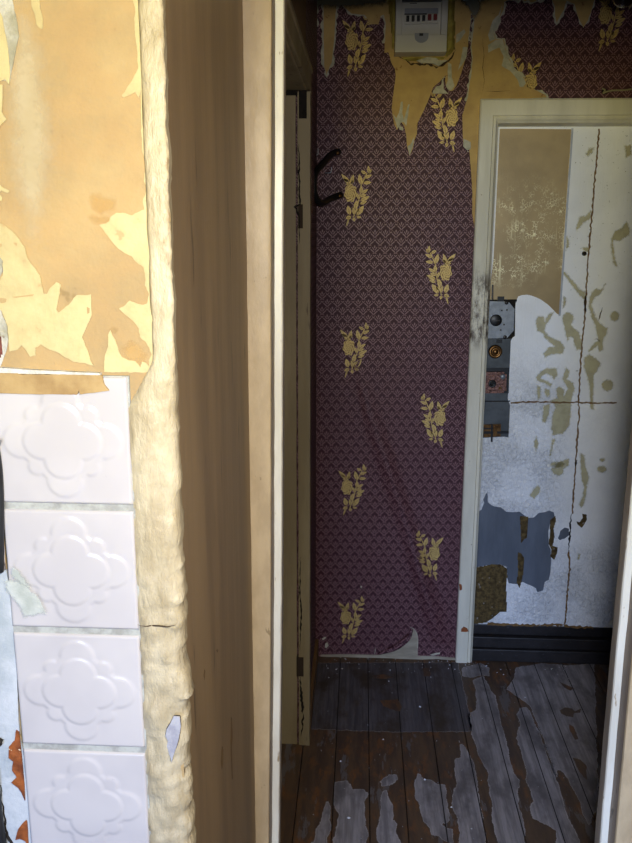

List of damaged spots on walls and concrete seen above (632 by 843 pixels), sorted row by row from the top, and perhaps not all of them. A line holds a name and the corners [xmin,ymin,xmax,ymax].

flaking render [0,0,19,126]
peeling [122,0,144,155]
peeling [0,223,94,367]
peeling [100,173,153,373]
flaking render [0,547,31,843]
peeling [311,662,599,843]